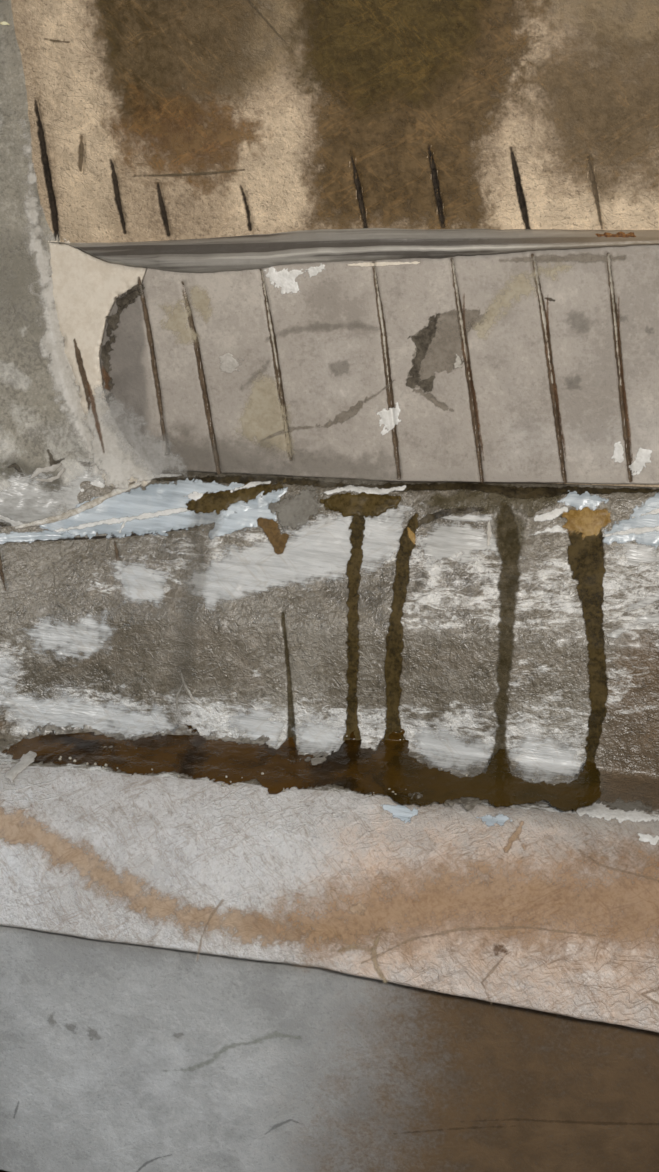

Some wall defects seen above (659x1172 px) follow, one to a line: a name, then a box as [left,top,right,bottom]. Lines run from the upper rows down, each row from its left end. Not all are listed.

crack [35,99,59,241]
crack [78,135,252,236]
water stain [96,0,258,191]
crack [351,157,367,228]
crack [428,146,445,228]
water stain [300,0,659,230]
spalling [267,309,495,438]
crack [451,258,484,483]
crack [510,147,567,483]
water stain [54,474,659,765]